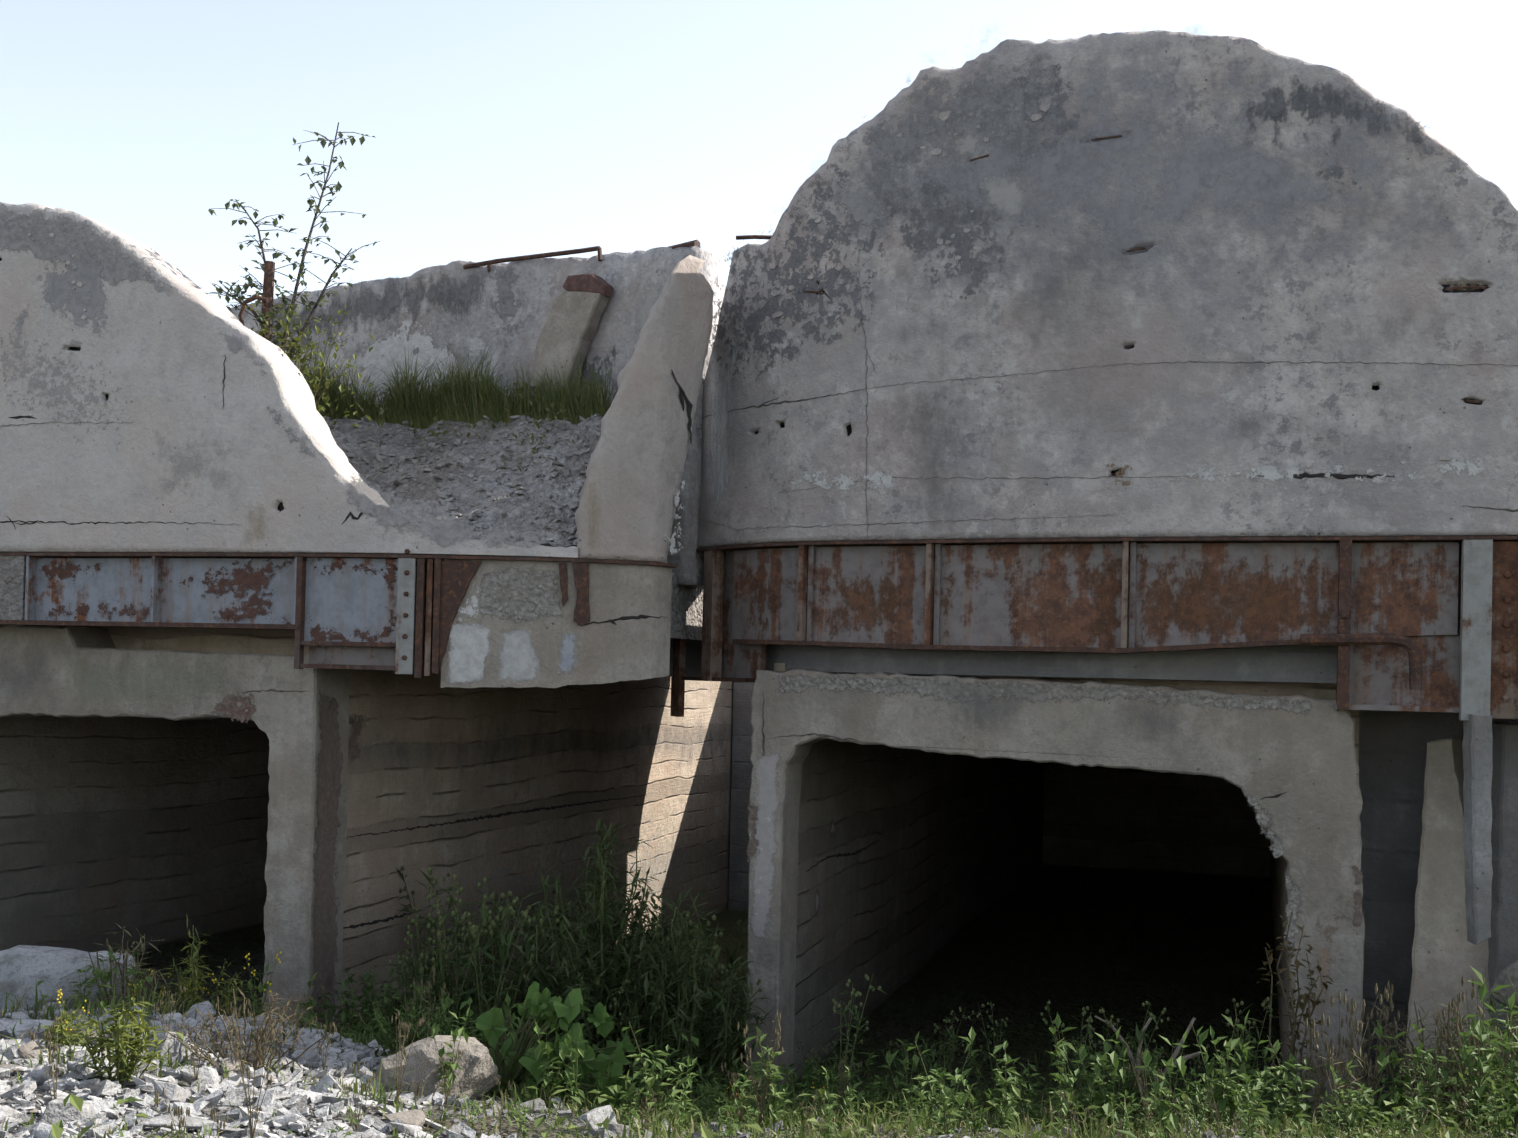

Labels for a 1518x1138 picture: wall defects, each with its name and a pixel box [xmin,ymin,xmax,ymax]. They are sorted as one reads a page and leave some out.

rust [823,575,902,643]
rust [1074,554,1331,646]